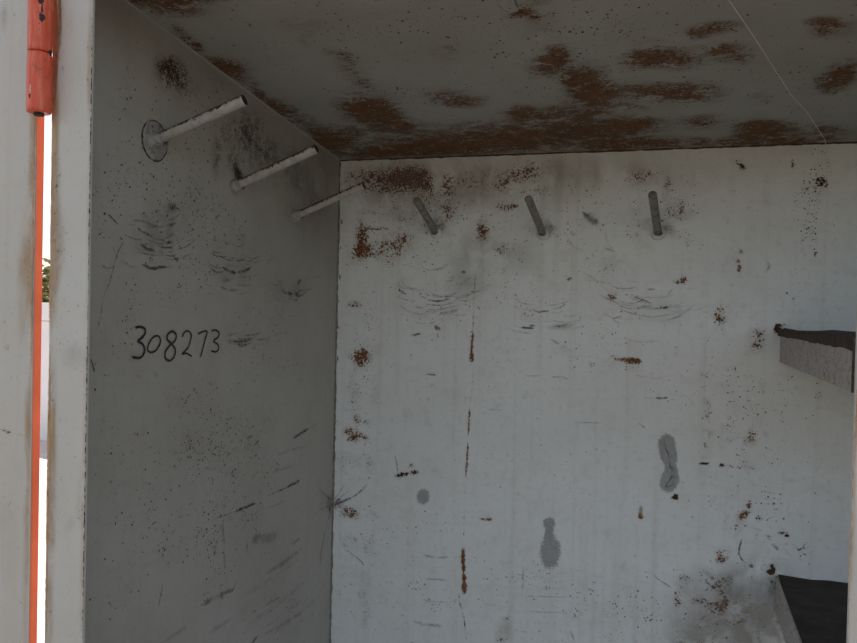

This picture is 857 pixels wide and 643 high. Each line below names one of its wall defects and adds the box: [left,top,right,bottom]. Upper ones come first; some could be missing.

rust [127,0,857,366]
rust [337,284,378,483]
rust [565,341,642,377]
rust [78,425,98,587]
water stain [541,518,560,566]
water stain [659,435,678,492]
rust [662,545,775,643]